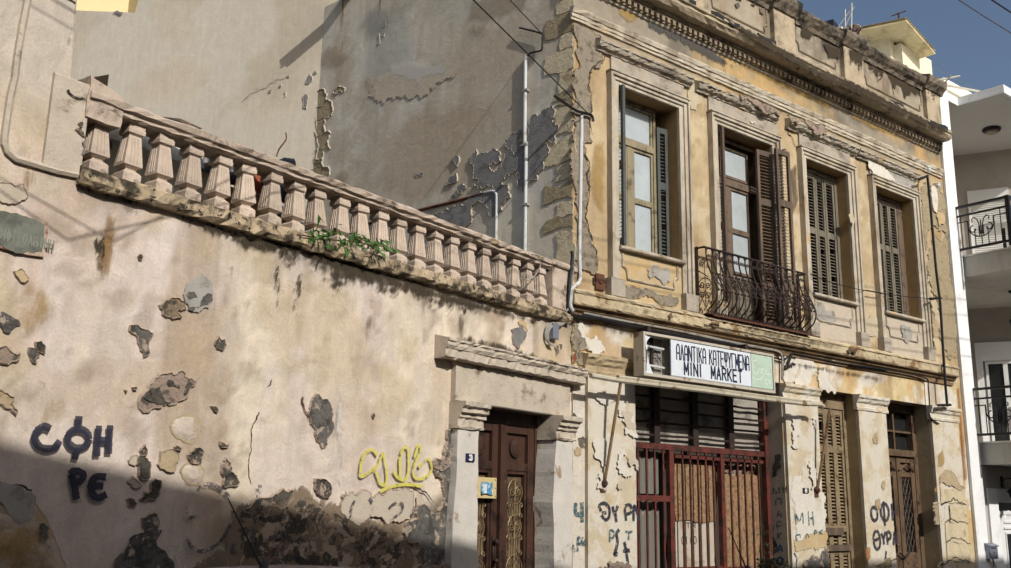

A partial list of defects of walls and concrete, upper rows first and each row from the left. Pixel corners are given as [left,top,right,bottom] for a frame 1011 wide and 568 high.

spalling [302,70,346,177]
peeling [433,106,559,228]
spalling [569,23,604,275]
leakage [740,26,947,134]
leakage [94,238,105,269]
spalling [128,323,153,358]
spalling [124,369,197,414]
peeling [158,273,214,321]
peeling [307,393,335,449]
leakage [204,223,537,357]
peeling [115,444,204,568]
spalling [194,429,452,568]